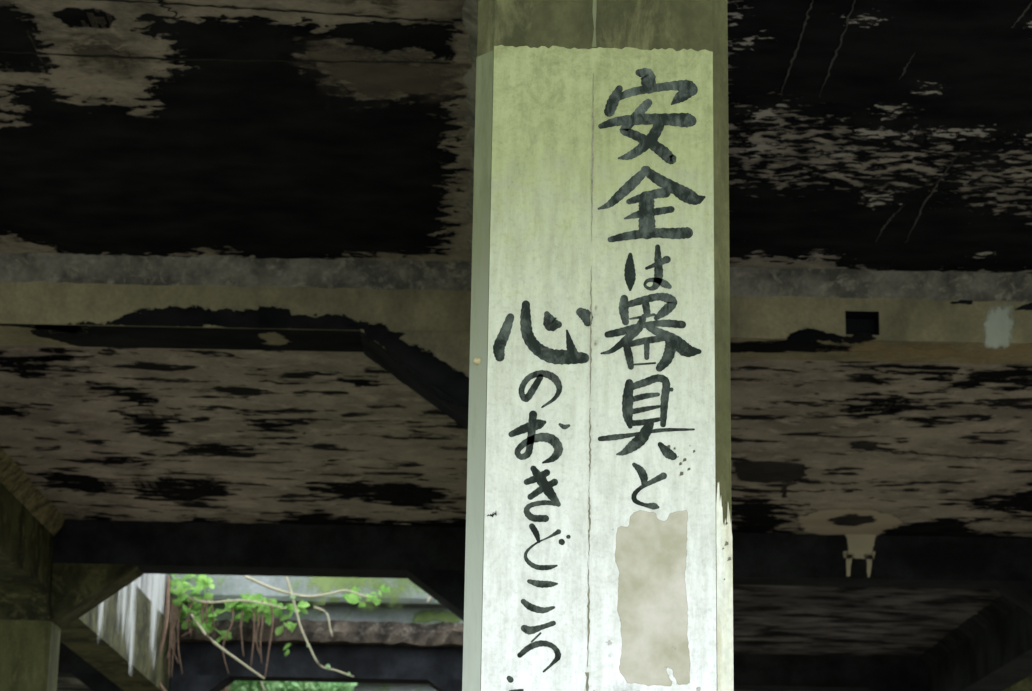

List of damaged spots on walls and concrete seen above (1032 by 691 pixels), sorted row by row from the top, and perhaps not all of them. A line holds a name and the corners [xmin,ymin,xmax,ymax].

leakage [297,38,472,100]
leakage [0,324,83,333]
peeling [608,510,700,691]